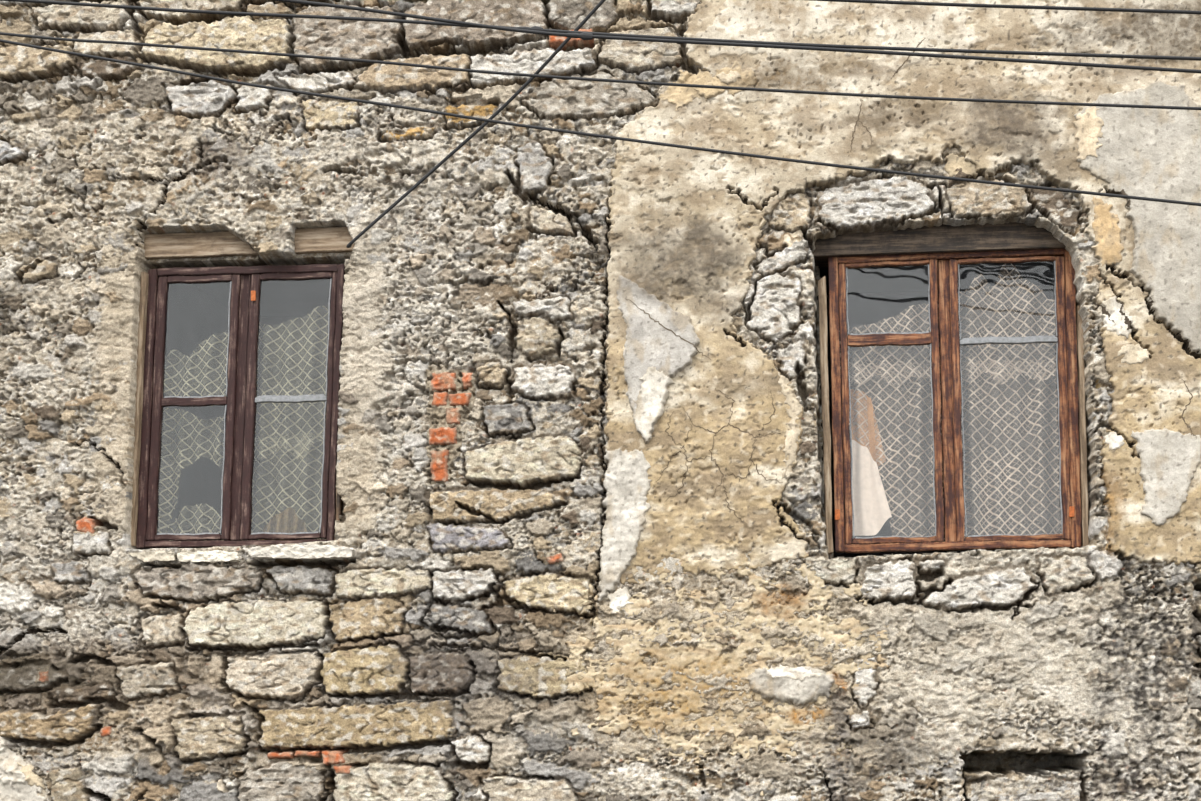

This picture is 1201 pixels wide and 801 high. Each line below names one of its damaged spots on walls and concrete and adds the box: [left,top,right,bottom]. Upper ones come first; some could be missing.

crack [528,196,804,626]
flaking render [658,61,757,111]
crack [729,189,779,210]
flaking render [736,80,1201,563]